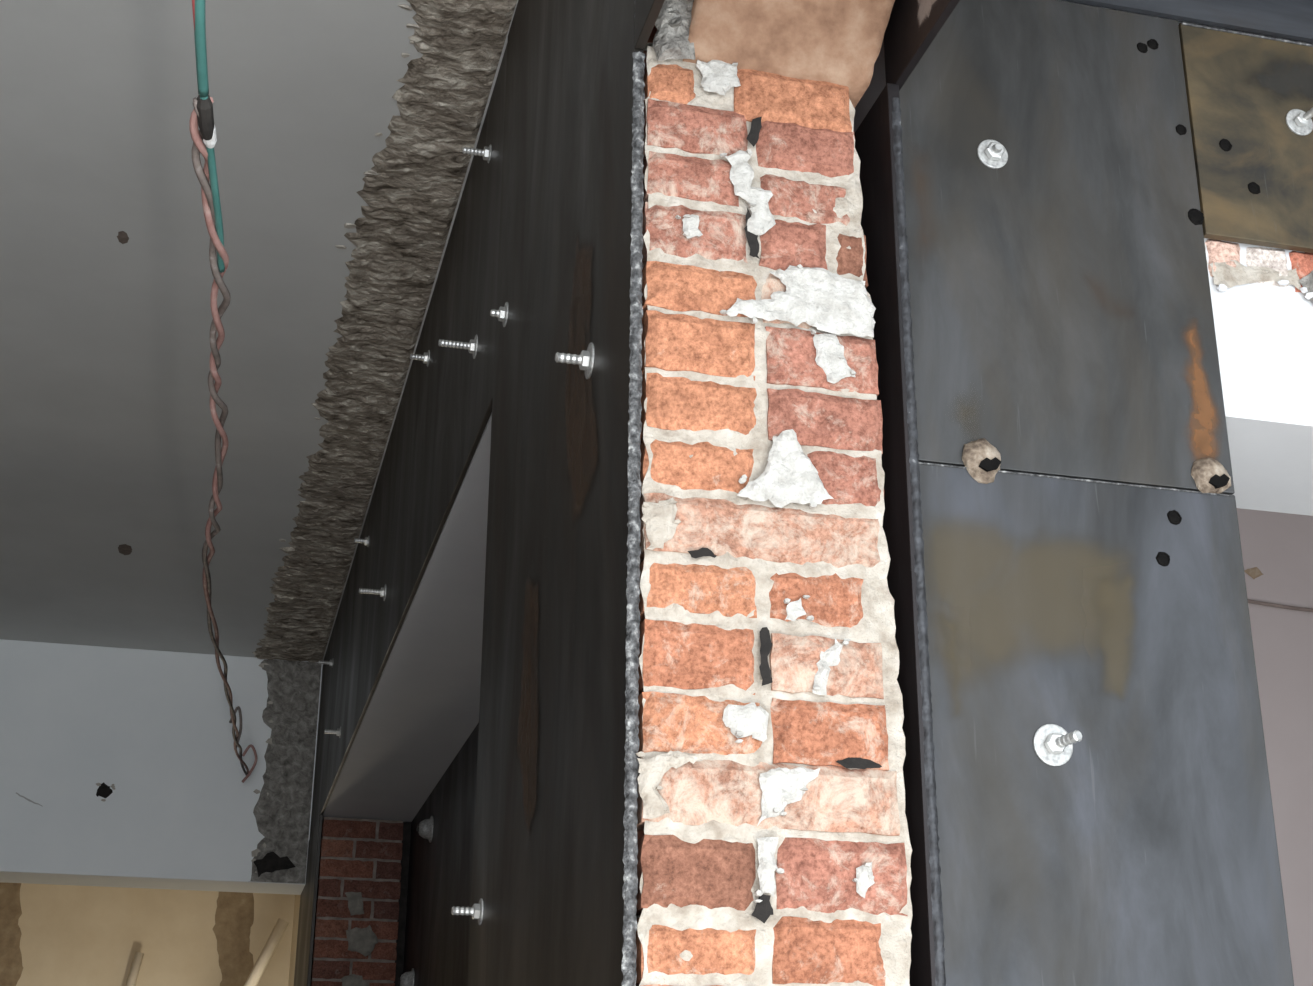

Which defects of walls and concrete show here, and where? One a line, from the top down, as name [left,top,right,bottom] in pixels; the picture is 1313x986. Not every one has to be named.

flaking render [1204,239,1313,301]
corrosion [1187,329,1216,459]
flaking render [213,0,517,986]